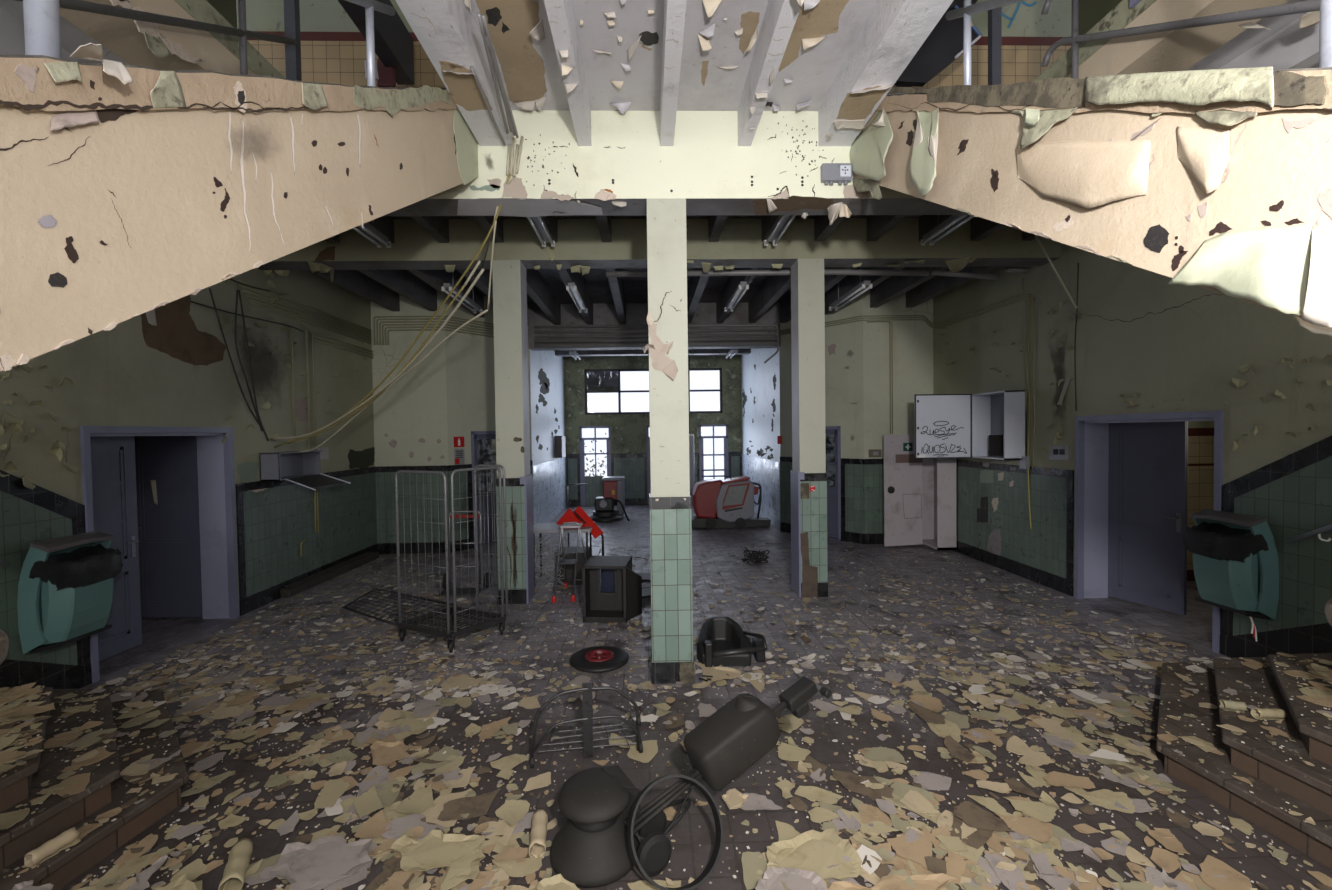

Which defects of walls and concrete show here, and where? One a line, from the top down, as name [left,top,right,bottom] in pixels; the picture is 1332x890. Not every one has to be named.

peeling [464,0,547,112]
peeling [559,50,578,94]
peeling [592,0,659,114]
peeling [698,0,760,86]
peeling [748,0,849,129]
crack [0,100,313,166]
peeling [754,67,1318,225]
peeling [48,236,79,288]
peeling [1143,200,1332,336]
crack [0,342,16,371]
flaking render [54,288,226,366]
peeling [644,310,678,380]